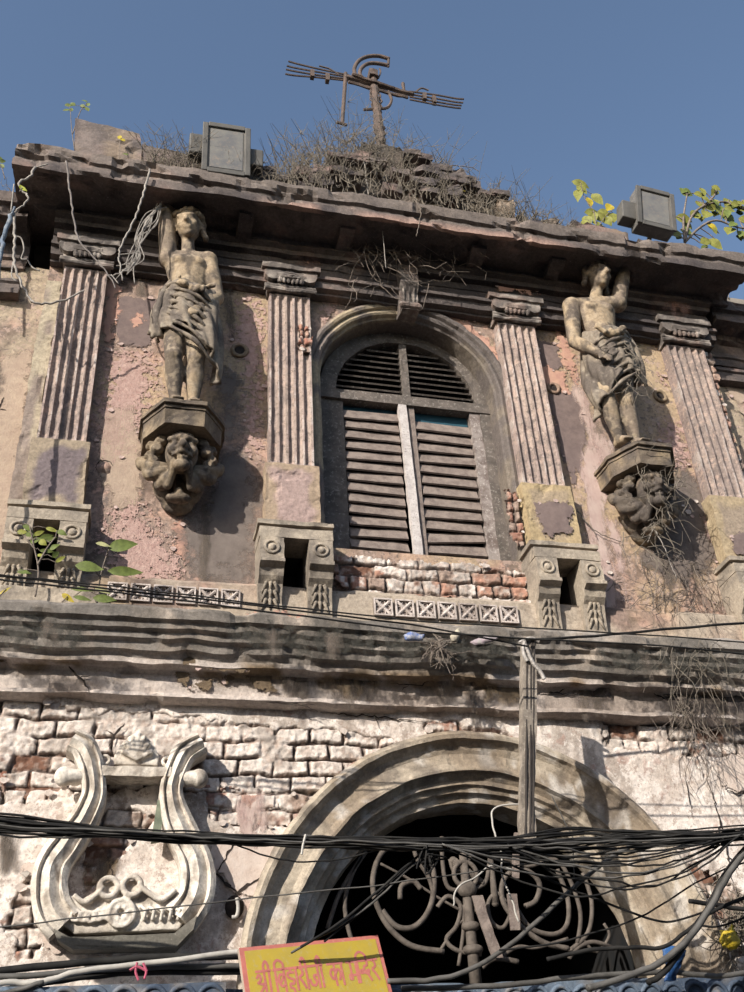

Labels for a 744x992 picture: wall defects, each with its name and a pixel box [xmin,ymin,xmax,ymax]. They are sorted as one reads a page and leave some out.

peeling [90,279,190,580]
peeling [536,331,588,487]
spalling [334,554,531,603]
peeling [503,489,574,547]
peeling [730,531,744,555]
crack [68,666,90,693]
spalling [422,720,470,733]
spalling [601,721,744,792]
spalling [0,698,396,896]
crack [684,769,744,889]